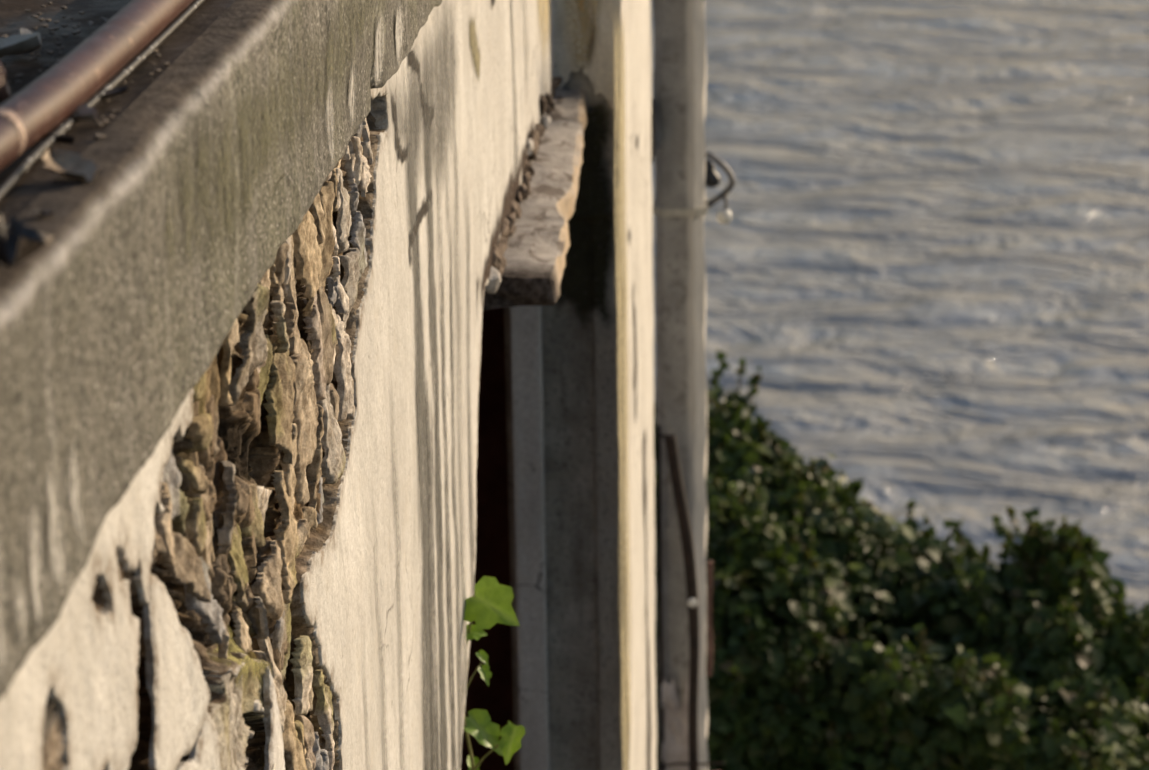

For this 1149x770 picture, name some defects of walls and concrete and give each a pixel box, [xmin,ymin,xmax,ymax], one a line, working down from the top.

damp [375,11,403,79]
damp [470,20,480,76]
spalling [477,65,563,299]
damp [396,18,475,770]
spalling [116,118,380,770]
flaking render [91,577,107,612]
flaking render [42,691,64,770]